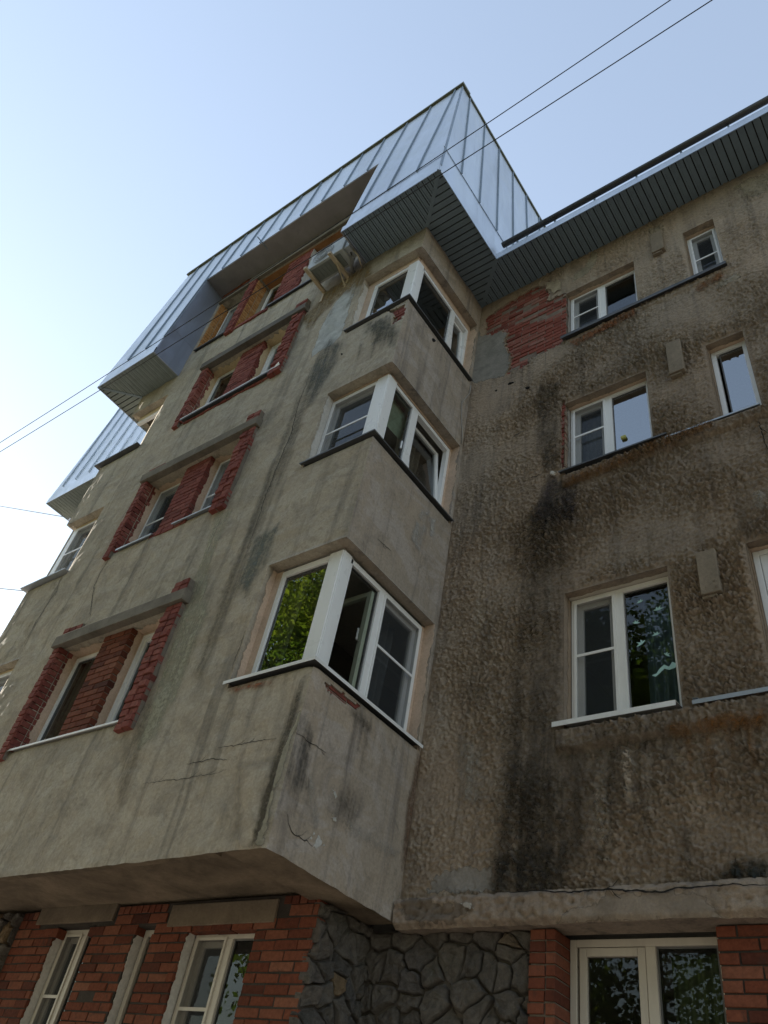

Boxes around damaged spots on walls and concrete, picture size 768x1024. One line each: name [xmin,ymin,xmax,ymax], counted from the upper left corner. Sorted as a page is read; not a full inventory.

flaking render [486,279,568,374]
crack [150,734,326,783]
crack [506,879,762,899]